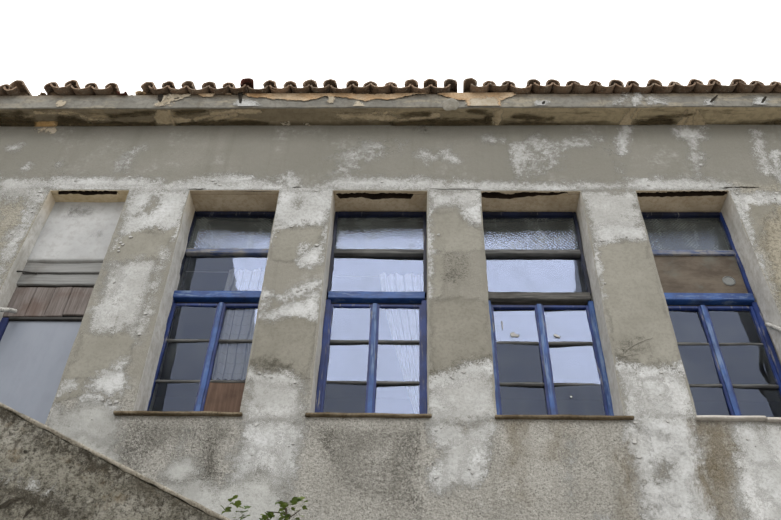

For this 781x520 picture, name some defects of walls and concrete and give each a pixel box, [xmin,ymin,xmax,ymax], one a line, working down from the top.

flaking render [154,94,191,126]
peeling [609,92,671,107]
leakage [728,120,781,185]